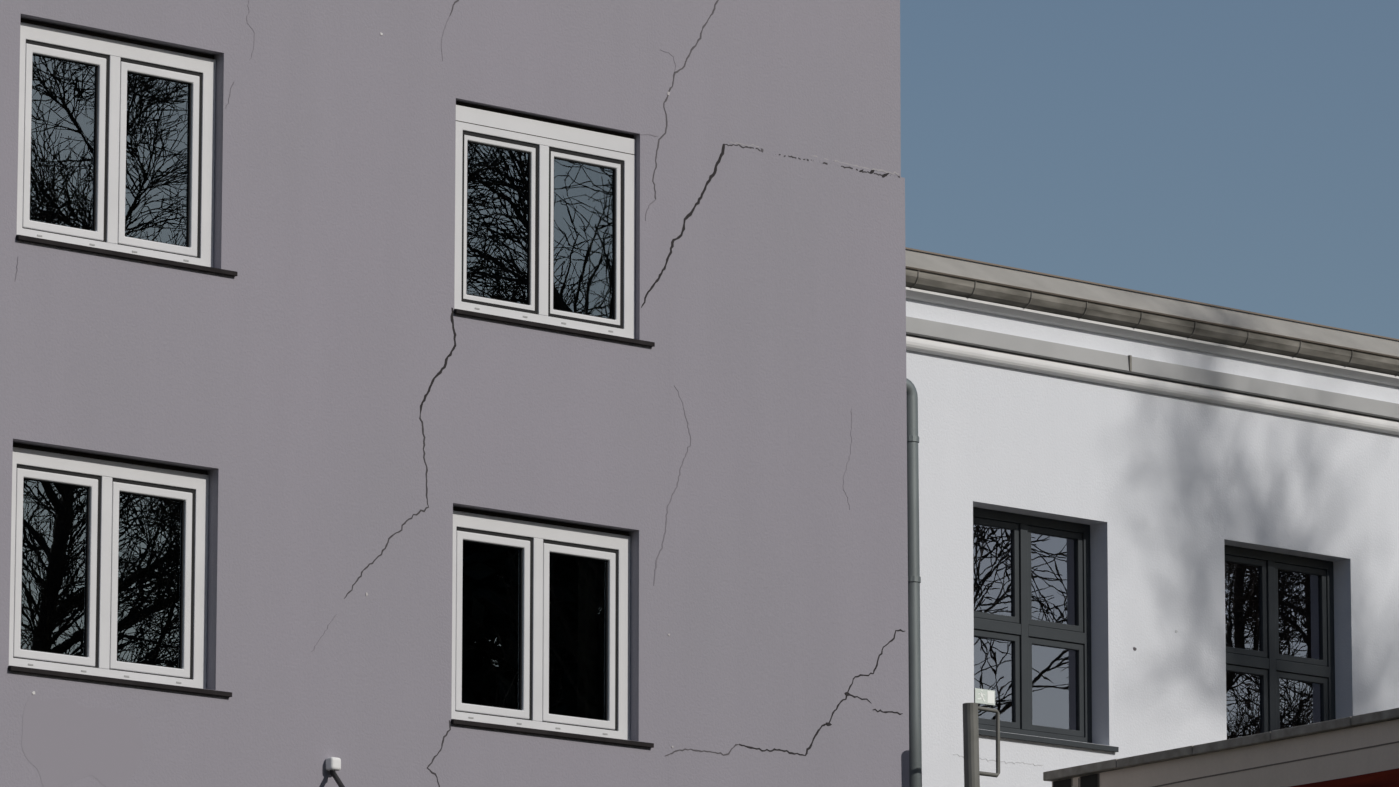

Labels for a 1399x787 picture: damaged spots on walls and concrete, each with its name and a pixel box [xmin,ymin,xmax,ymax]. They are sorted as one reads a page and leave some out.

crack [441,0,459,61]
crack [641,0,900,308]
crack [312,308,456,651]
crack [654,385,691,583]
crack [427,720,451,787]
crack [665,629,904,756]